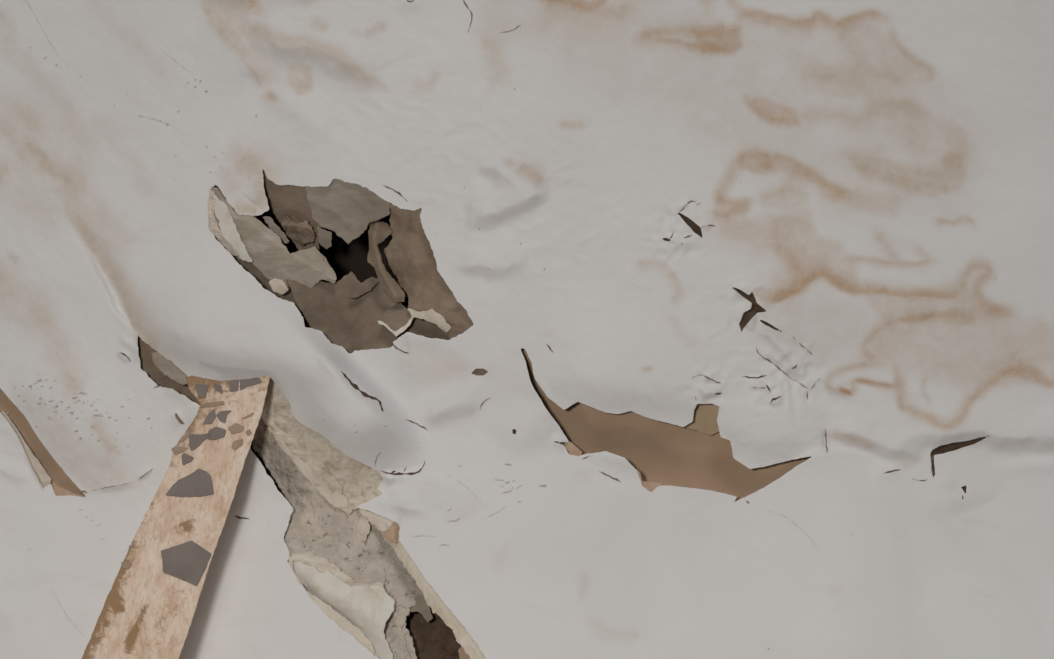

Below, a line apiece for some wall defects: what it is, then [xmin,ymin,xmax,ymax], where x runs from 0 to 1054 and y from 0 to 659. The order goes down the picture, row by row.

flaking render [166,377,262,497]
flaking render [161,541,211,586]
spalling [275,438,486,659]